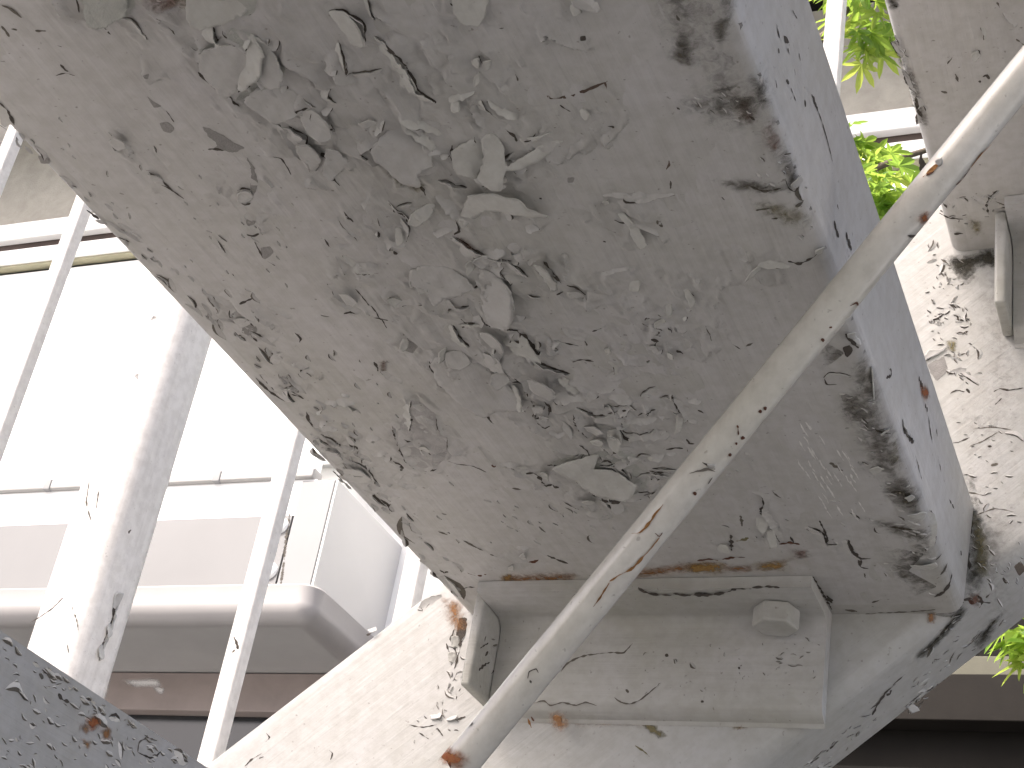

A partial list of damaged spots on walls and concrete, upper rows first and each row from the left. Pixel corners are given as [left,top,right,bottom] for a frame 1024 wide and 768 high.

peeling [185,0,349,186]
peeling [324,0,436,103]
mould [676,36,689,63]
mould [728,142,807,220]
peeling [355,56,696,544]
peeling [924,239,983,386]
mould [823,345,938,595]
corrosion [593,505,783,607]
mould [967,498,995,588]
peeling [2,637,188,768]
corrosion [82,717,110,748]
corrosion [441,748,464,768]